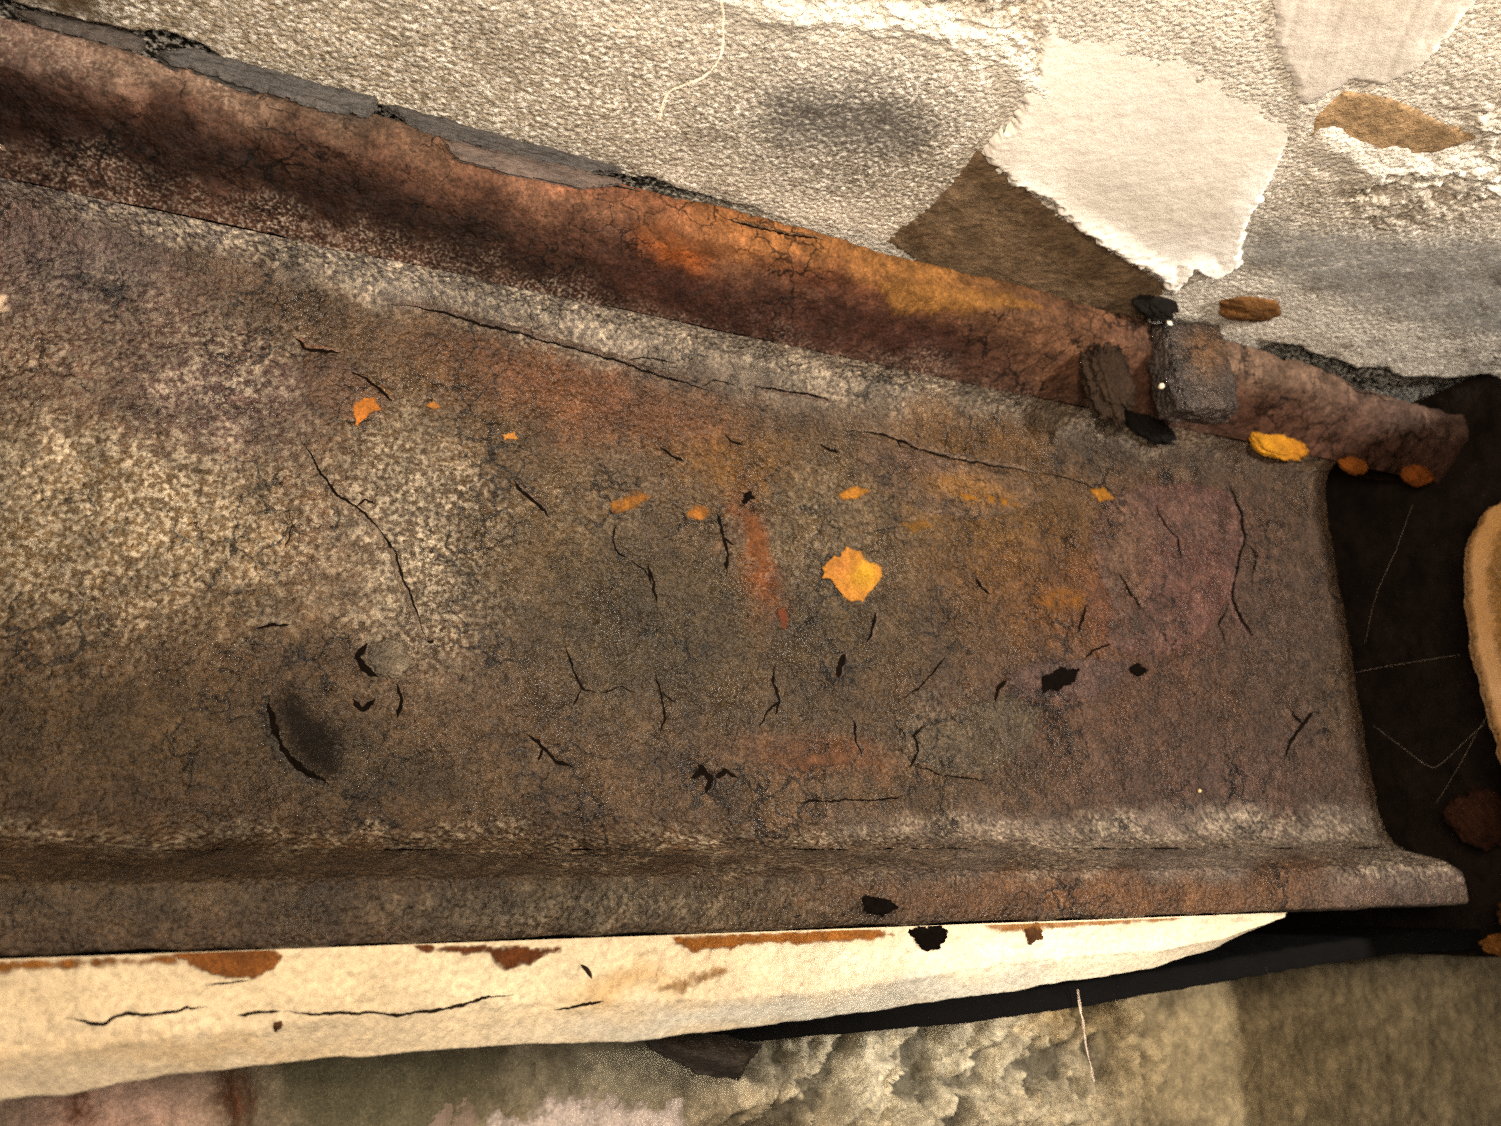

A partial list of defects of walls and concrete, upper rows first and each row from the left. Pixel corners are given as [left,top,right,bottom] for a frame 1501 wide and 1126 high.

rust [16,10,625,190]
spalling [1310,91,1476,153]
flaking render [887,0,1289,321]
rust [1132,294,1179,323]
crack [387,299,1096,490]
crack [298,437,434,643]
rust [822,547,882,602]
crack [353,642,403,718]
rust [989,918,1178,931]
rust [0,950,283,978]
crack [70,980,514,1026]
crack [556,964,603,1010]